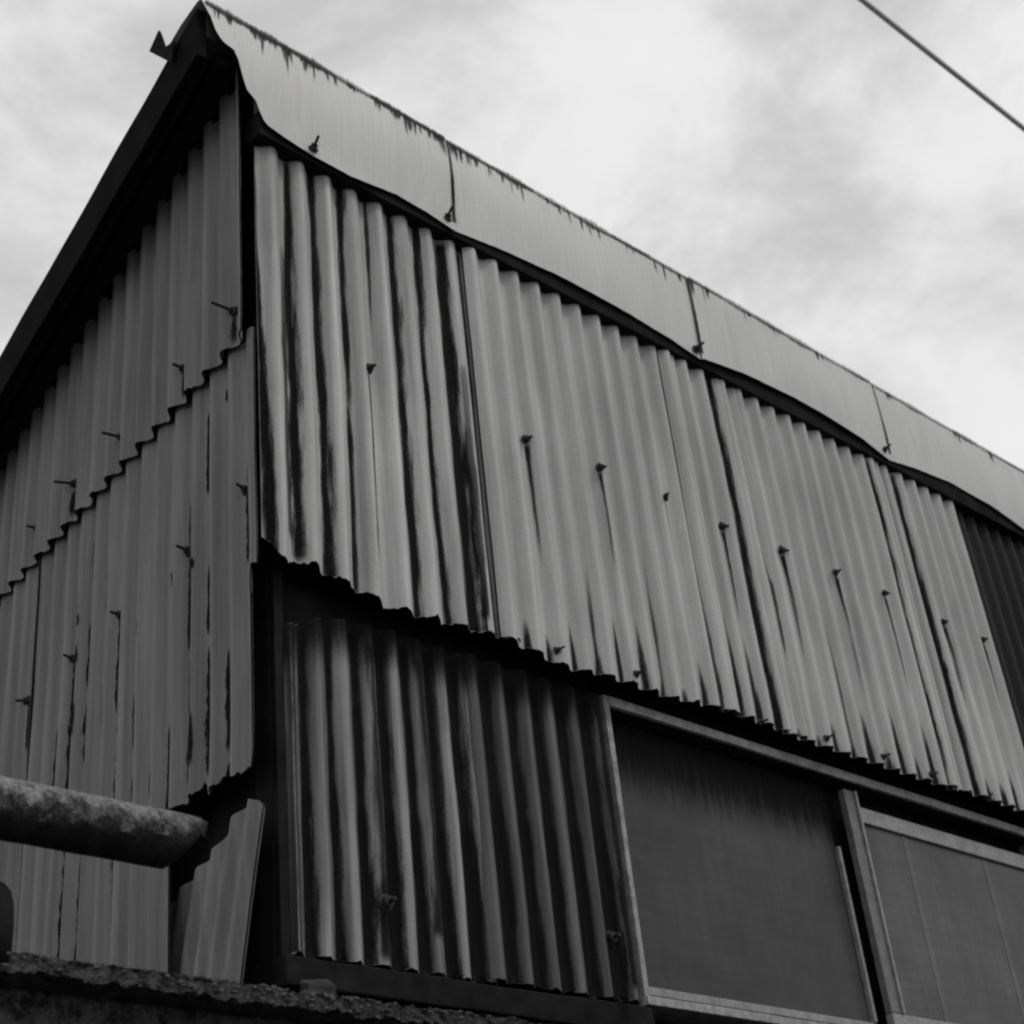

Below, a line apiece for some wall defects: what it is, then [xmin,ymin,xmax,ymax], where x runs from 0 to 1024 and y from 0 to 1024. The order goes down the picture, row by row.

corrosion [256,161,306,559]
corrosion [297,644,319,958]
corrosion [307,173,337,576]
corrosion [323,639,348,962]
corrosion [335,189,359,593]
corrosion [386,215,421,618]
corrosion [350,646,493,982]
corrosion [412,228,502,638]
corrosion [479,682,638,1001]
corrosion [205,0,1024,472]
corrosion [638,608,666,697]
corrosion [700,378,952,790]